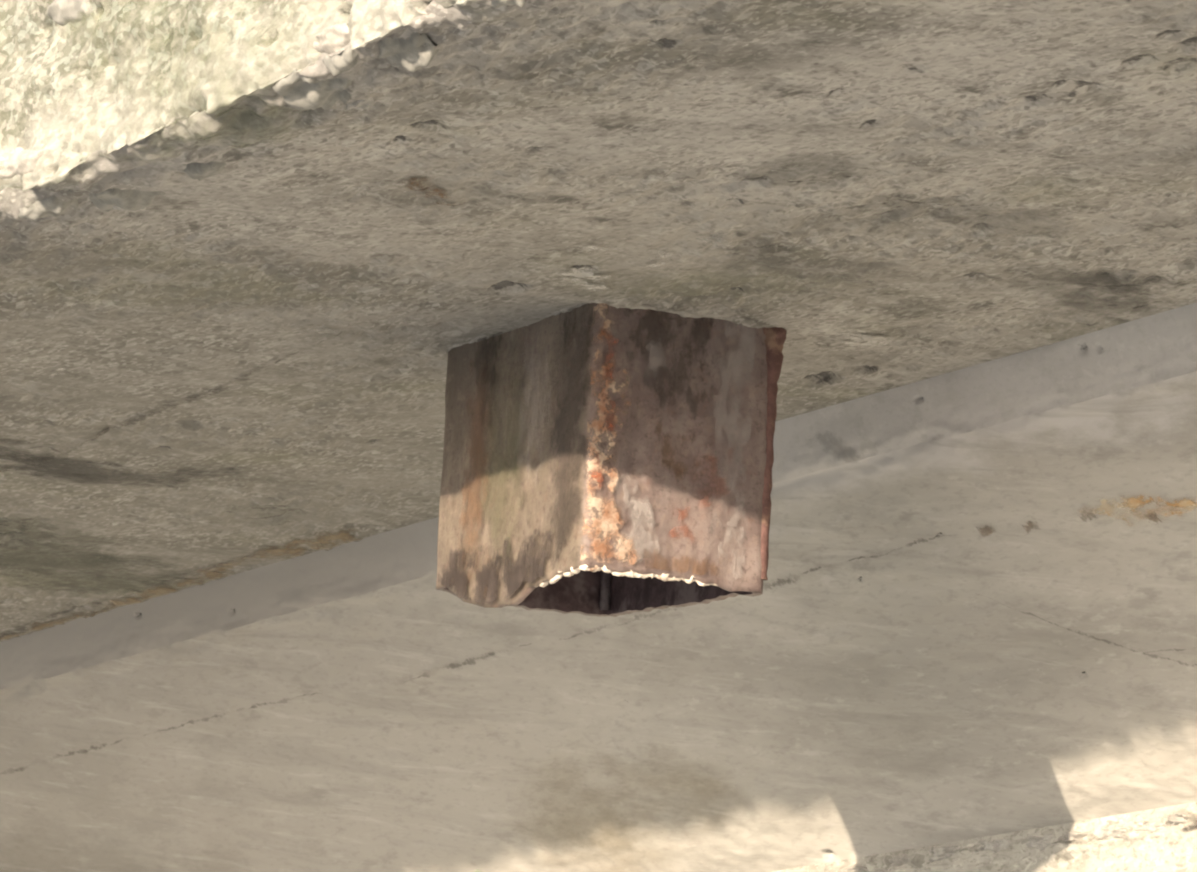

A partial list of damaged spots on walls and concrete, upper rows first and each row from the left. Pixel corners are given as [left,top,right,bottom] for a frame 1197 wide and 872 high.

water stain [0,439,235,487]
corrosion [437,303,652,603]
water stain [0,517,181,593]
corrosion [0,530,357,641]
flaking render [1163,812,1197,830]